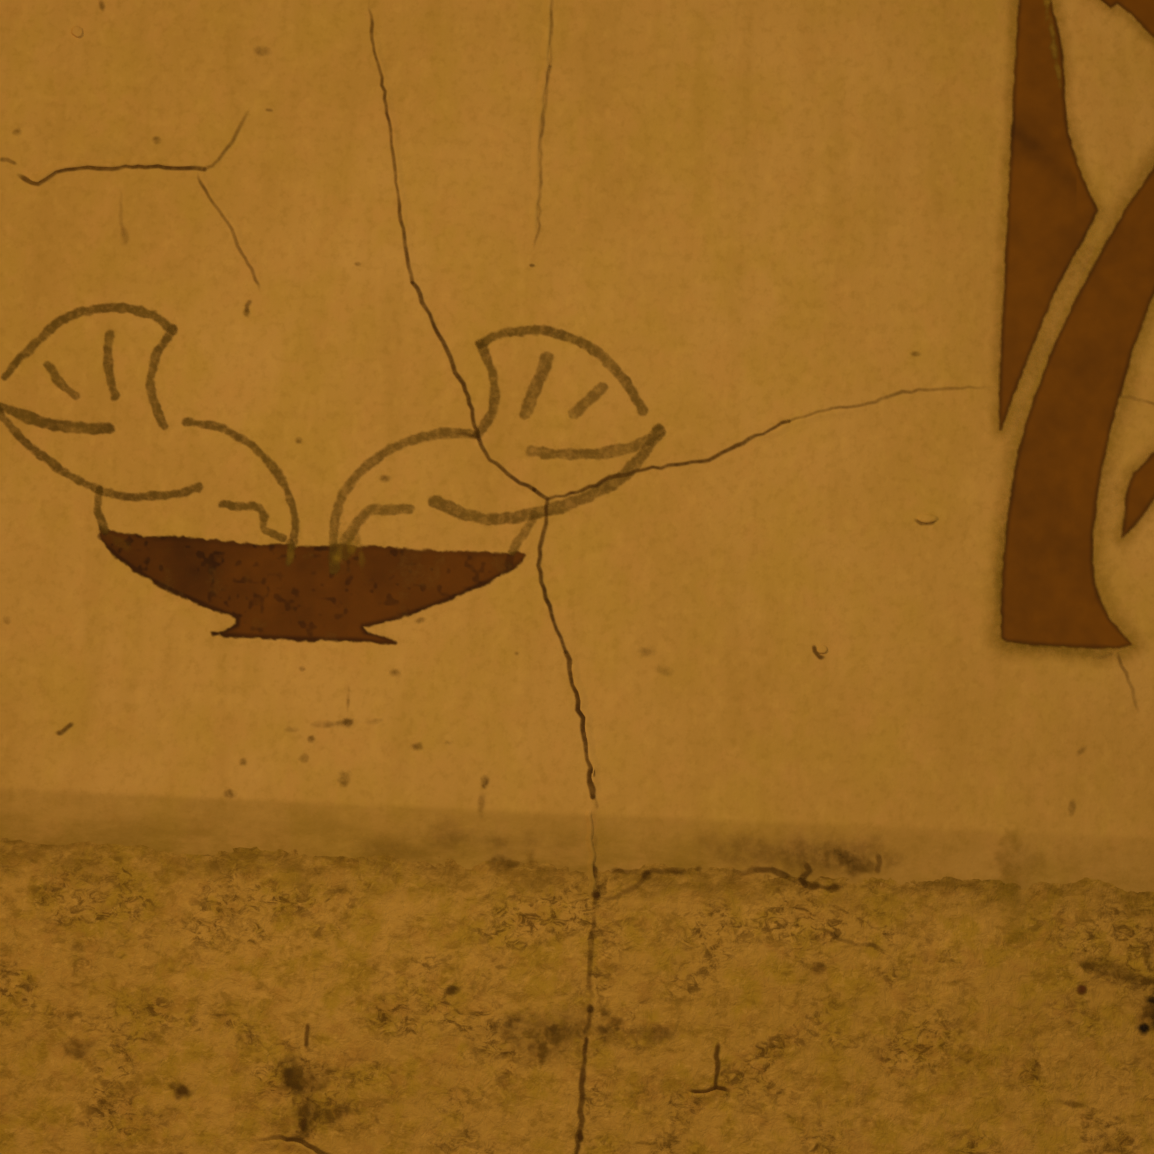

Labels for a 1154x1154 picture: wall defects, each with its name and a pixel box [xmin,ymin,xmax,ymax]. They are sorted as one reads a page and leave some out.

crack [21,154,259,272]
crack [371,8,868,898]
crack [575,1006,593,1154]
crack [685,1045,730,1105]